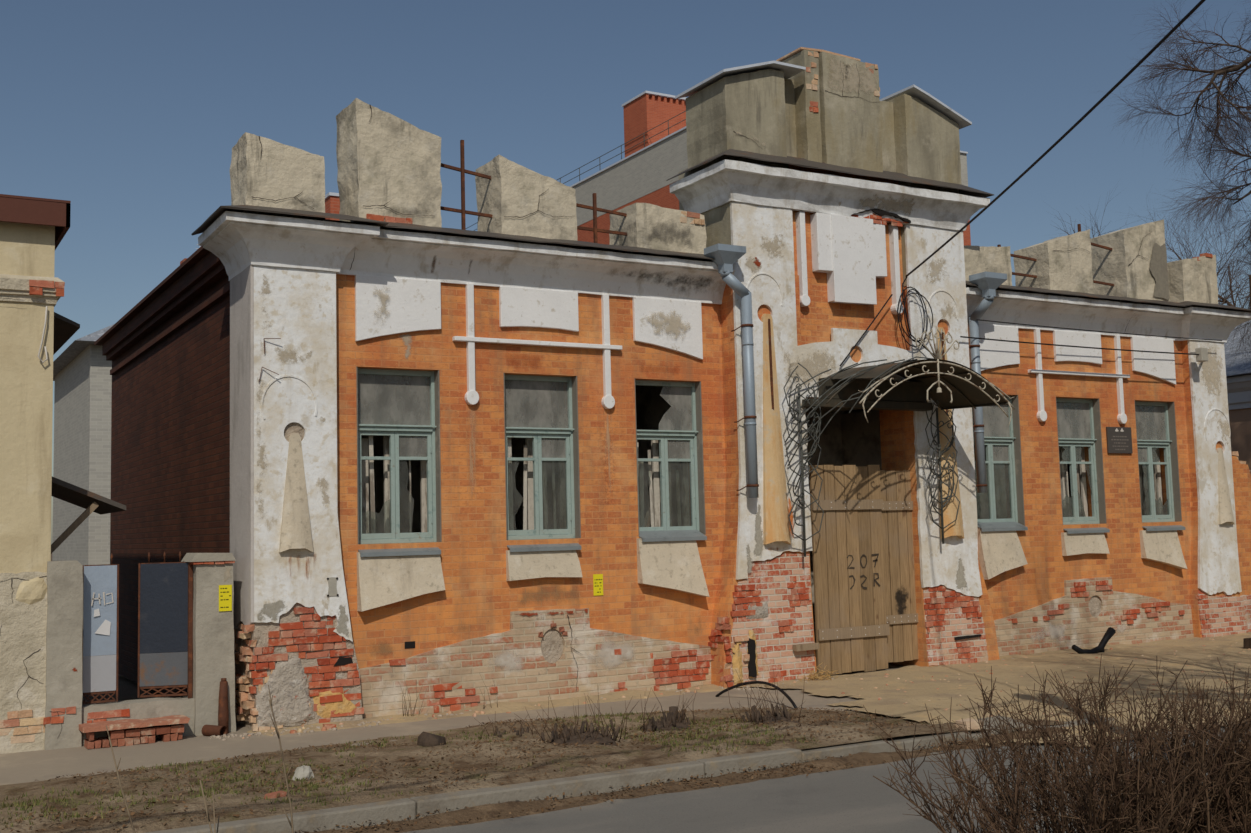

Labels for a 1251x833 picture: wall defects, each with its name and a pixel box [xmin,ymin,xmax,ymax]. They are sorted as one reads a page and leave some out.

flaking render [851,197,914,227]
spalling [519,609,588,637]
flaking render [650,505,816,691]
flaking render [923,558,988,666]
spalling [1033,580,1112,622]
flaking render [1115,588,1248,638]
flaking render [234,600,364,731]
spalling [427,682,498,713]
flaking render [0,706,130,744]